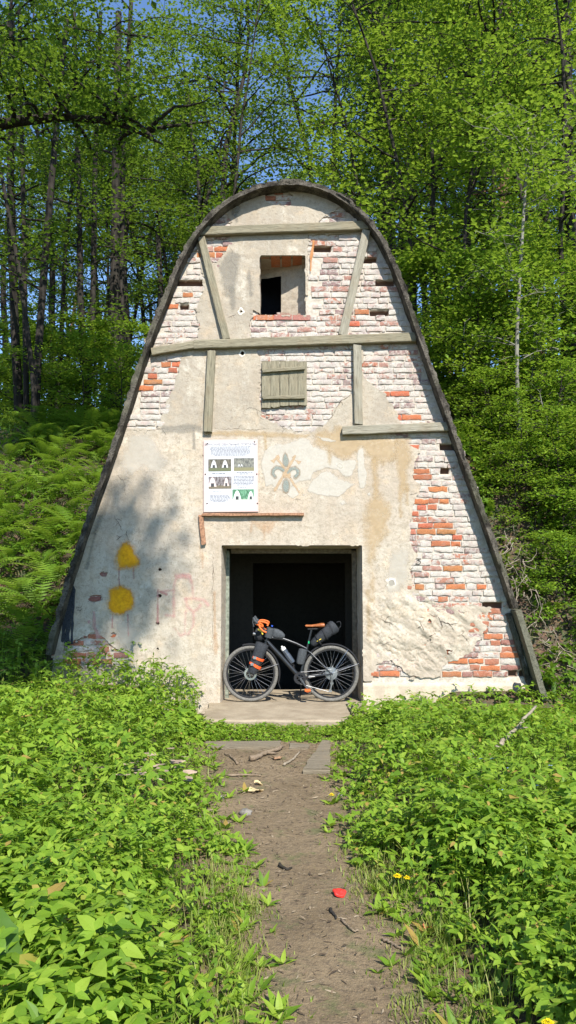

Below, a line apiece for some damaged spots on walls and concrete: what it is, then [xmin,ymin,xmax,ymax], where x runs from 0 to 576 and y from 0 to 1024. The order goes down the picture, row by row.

flaking render [127,214,234,432]
leakage [317,429,408,556]
flaking render [238,207,520,680]
flaking render [51,630,131,676]